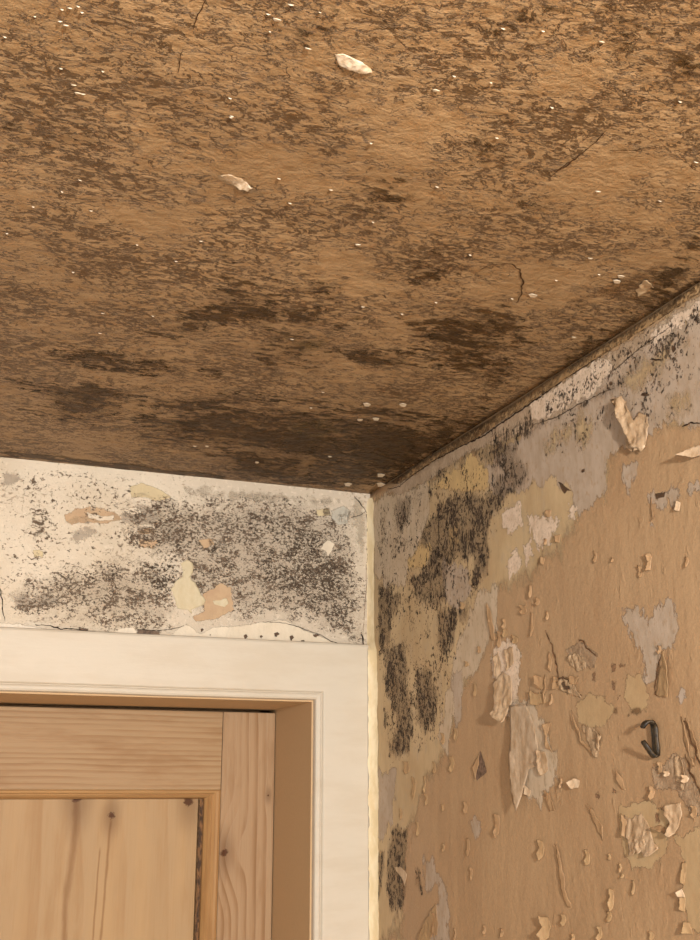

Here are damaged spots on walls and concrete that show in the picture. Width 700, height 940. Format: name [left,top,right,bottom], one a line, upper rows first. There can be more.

peeling [335,53,378,74]
peeling [217,175,257,193]
crack [548,131,659,177]
water stain [135,250,534,391]
crack [480,264,524,303]
water stain [642,233,700,310]
peeling [65,483,170,549]
water stain [0,342,495,643]
spalling [137,626,182,635]
water stain [375,446,532,757]
peeling [317,296,700,940]
water stain [378,823,423,912]